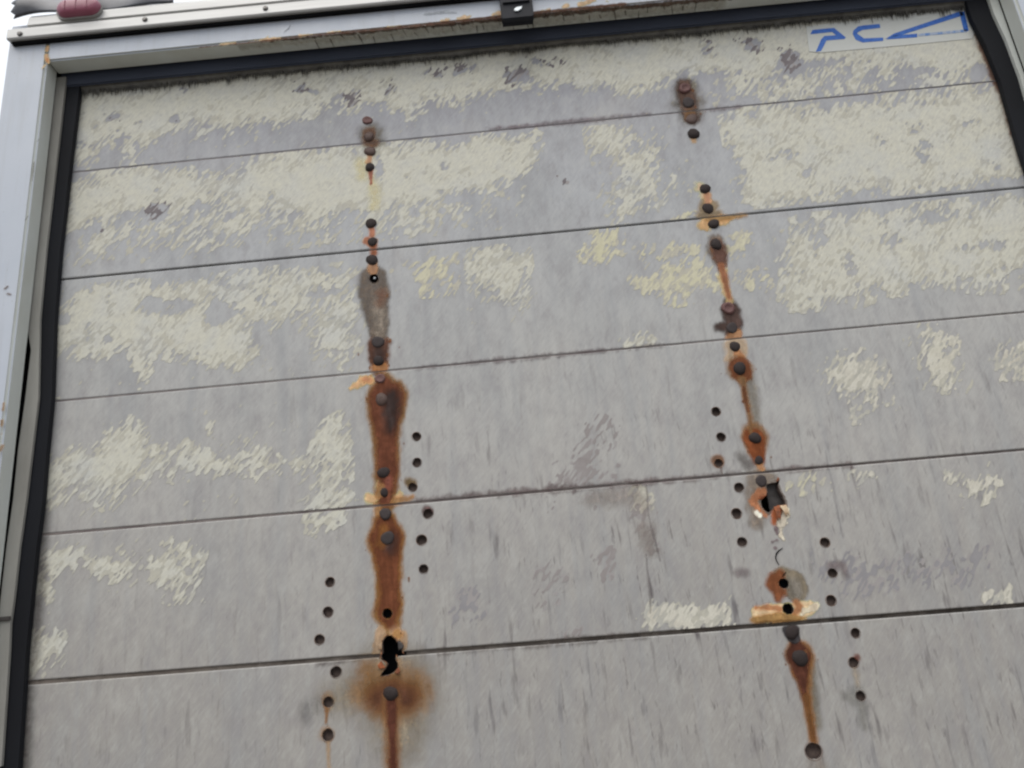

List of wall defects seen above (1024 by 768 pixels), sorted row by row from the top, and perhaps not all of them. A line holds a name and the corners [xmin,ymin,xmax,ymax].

rust [674,80,701,122]
peeling [63,11,1024,325]
peeling [57,261,367,391]
leakage [359,263,389,337]
rust [695,183,790,549]
peeling [45,408,359,539]
peeling [29,531,209,679]
rust [323,336,425,768]
peeling [635,595,736,631]
peeling [751,600,820,623]
rust [766,567,808,602]
rust [782,625,819,743]